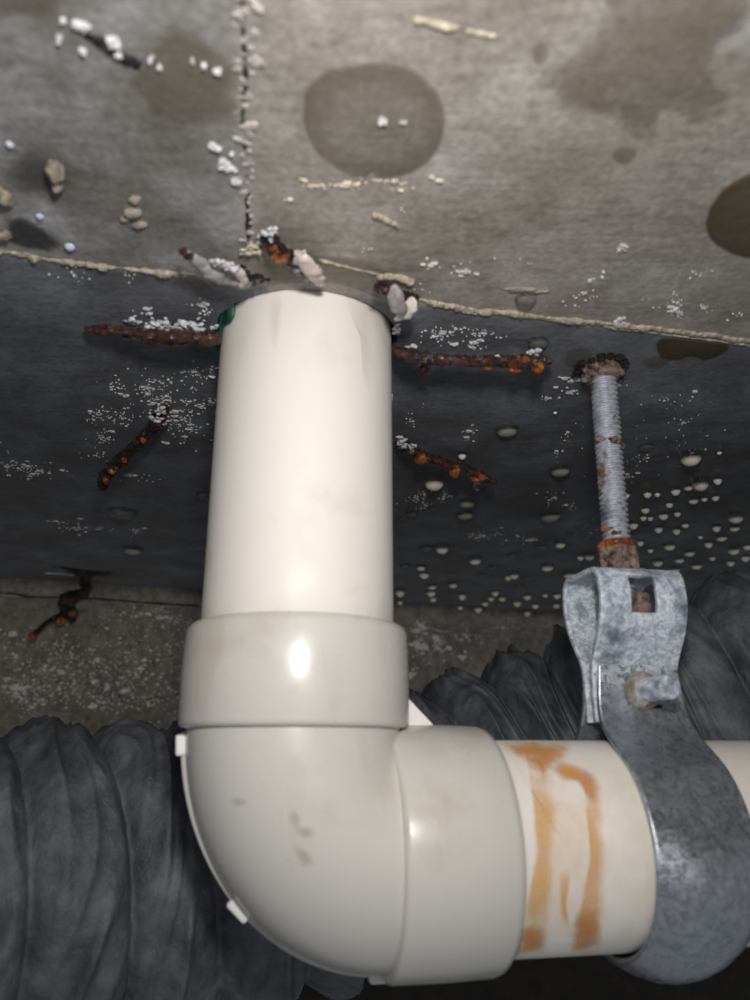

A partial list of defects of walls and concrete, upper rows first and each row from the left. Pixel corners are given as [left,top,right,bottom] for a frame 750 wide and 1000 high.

crack [231,0,267,257]
water stain [299,121,429,192]
water stain [308,64,443,137]
water stain [707,174,750,257]
peeling [208,259,249,288]
peeling [292,250,326,287]
peeling [394,296,418,321]
water stain [657,338,729,360]
water stain [79,360,219,462]
water stain [395,435,417,453]
corrosion [28,572,93,640]
crack [0,566,198,607]